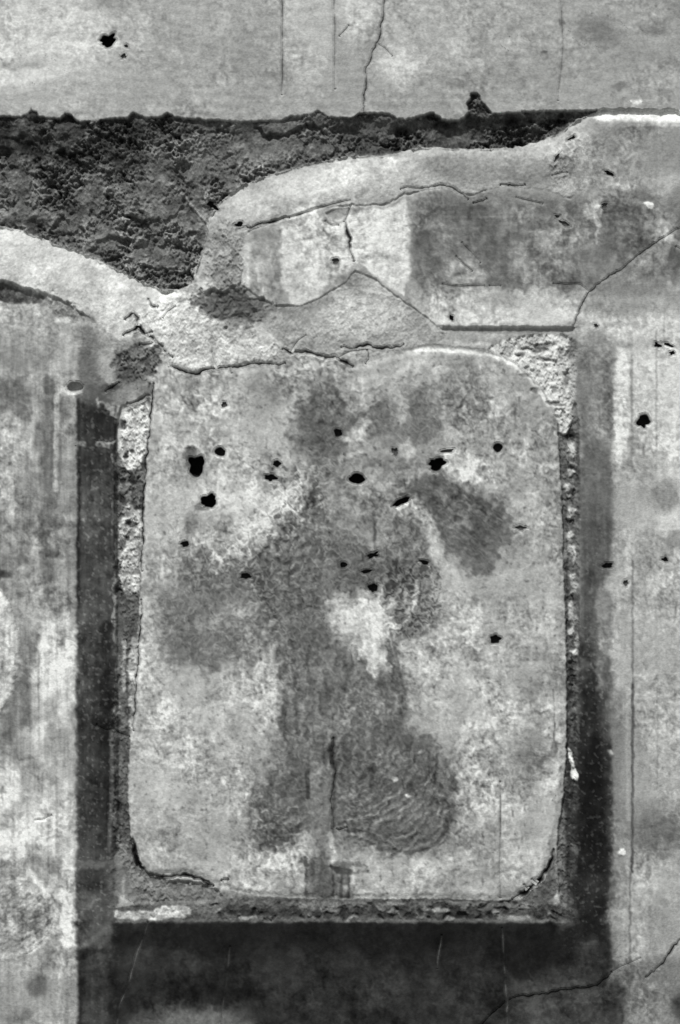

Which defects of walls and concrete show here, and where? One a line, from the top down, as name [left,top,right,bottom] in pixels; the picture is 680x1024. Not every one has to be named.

crack [361,0,393,112]
flaking render [0,93,593,335]
crack [237,198,356,261]
crack [400,182,543,205]
crack [443,242,500,289]
crack [553,227,680,327]
flaking render [110,342,162,472]
spalling [183,446,200,461]
flaking render [489,333,577,435]
flaking render [117,500,142,597]
crack [131,839,228,887]
crack [480,928,680,1024]